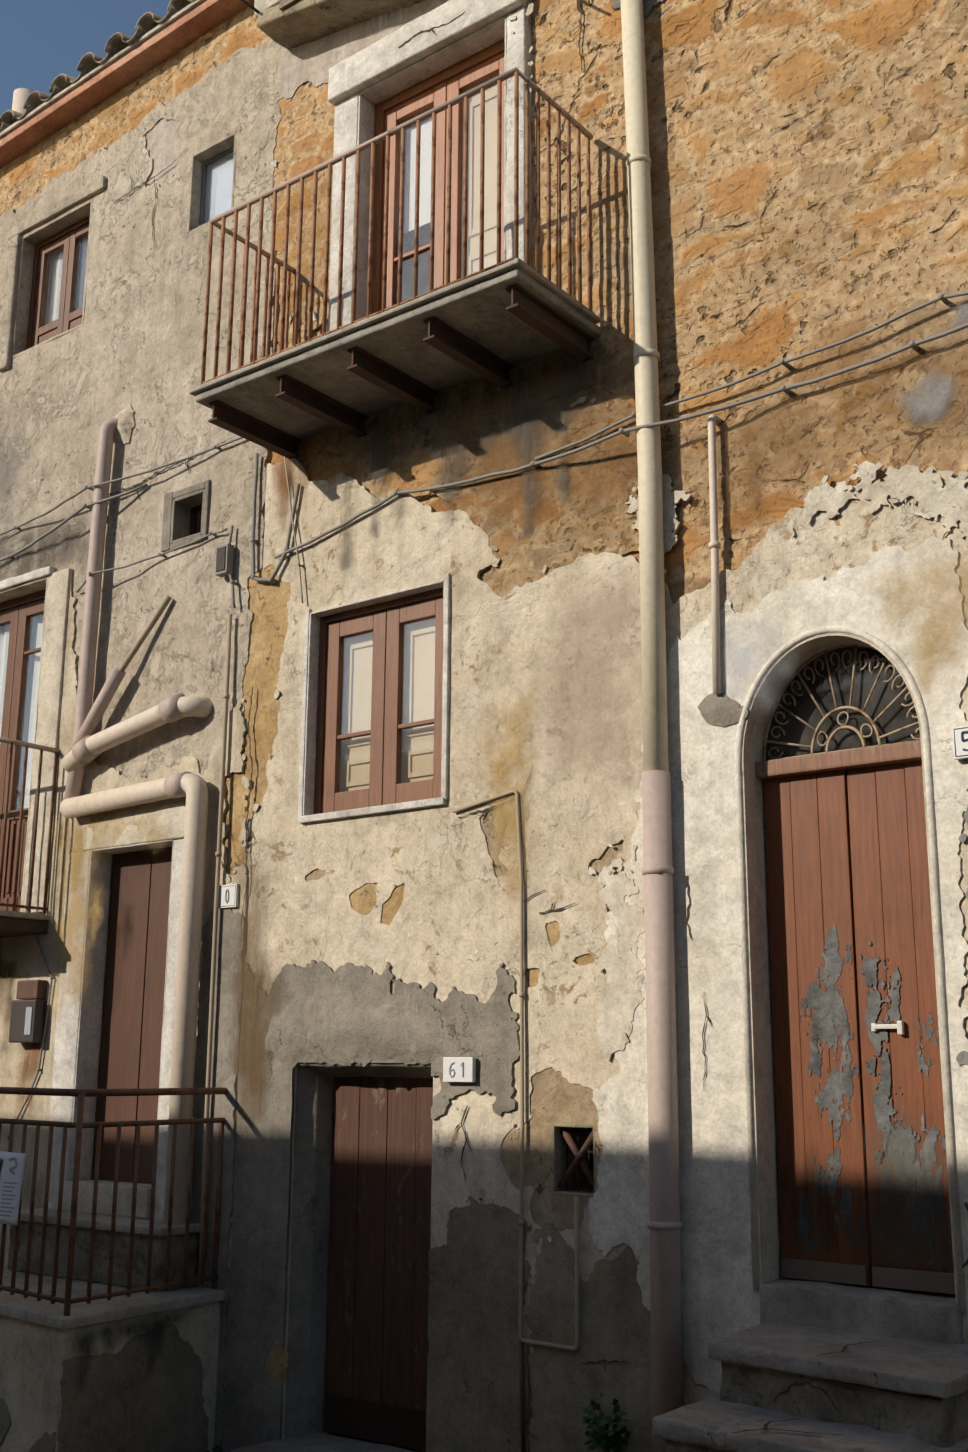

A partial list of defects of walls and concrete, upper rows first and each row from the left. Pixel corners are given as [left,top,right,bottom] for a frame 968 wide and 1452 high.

flaking render [269,82,335,346]
flaking render [425,386,640,600]
peeling [662,474,692,574]
peeling [789,461,968,547]
flaking render [350,883,405,925]
flaking render [480,807,512,877]
flaking render [524,968,540,987]
flaking render [546,920,560,947]
peeling [571,840,646,1061]
flaking render [501,1067,603,1242]
peeling [792,925,952,1267]
flaking render [28,1323,208,1452]